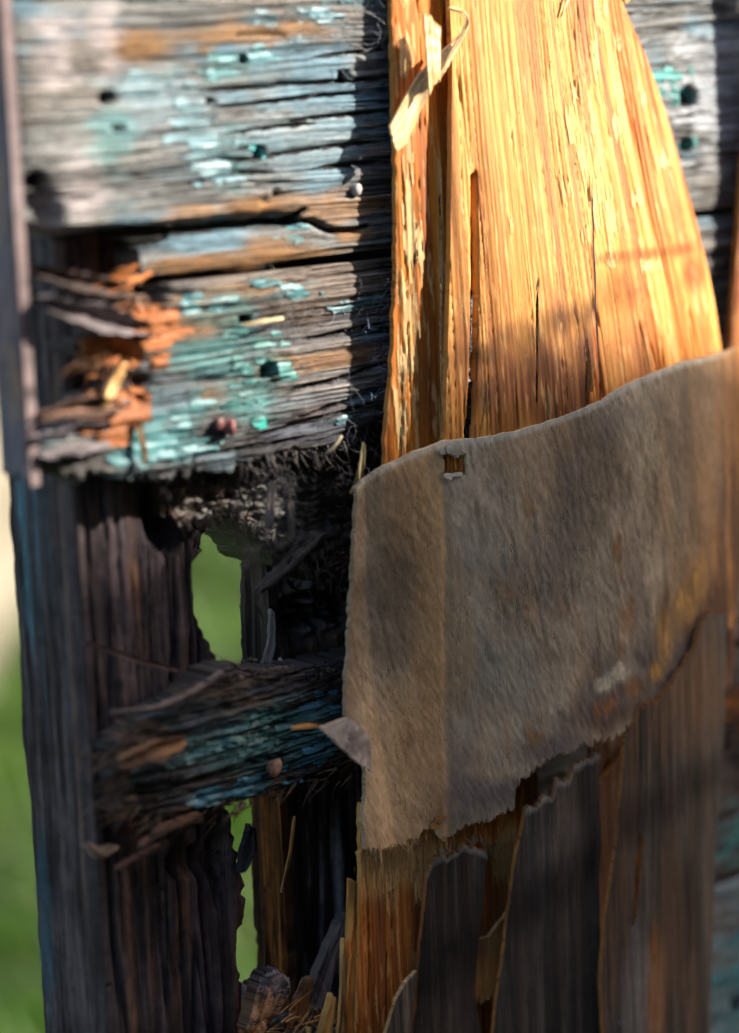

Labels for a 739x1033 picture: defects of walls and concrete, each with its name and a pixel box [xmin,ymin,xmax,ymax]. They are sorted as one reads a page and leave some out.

peeling [106,328,302,476]
peeling [180,293,241,314]
peeling [252,277,391,315]
peeling [331,393,377,426]
crack [438,168,488,436]
crack [533,283,541,402]
crack [586,183,601,404]
peeling [166,689,343,808]